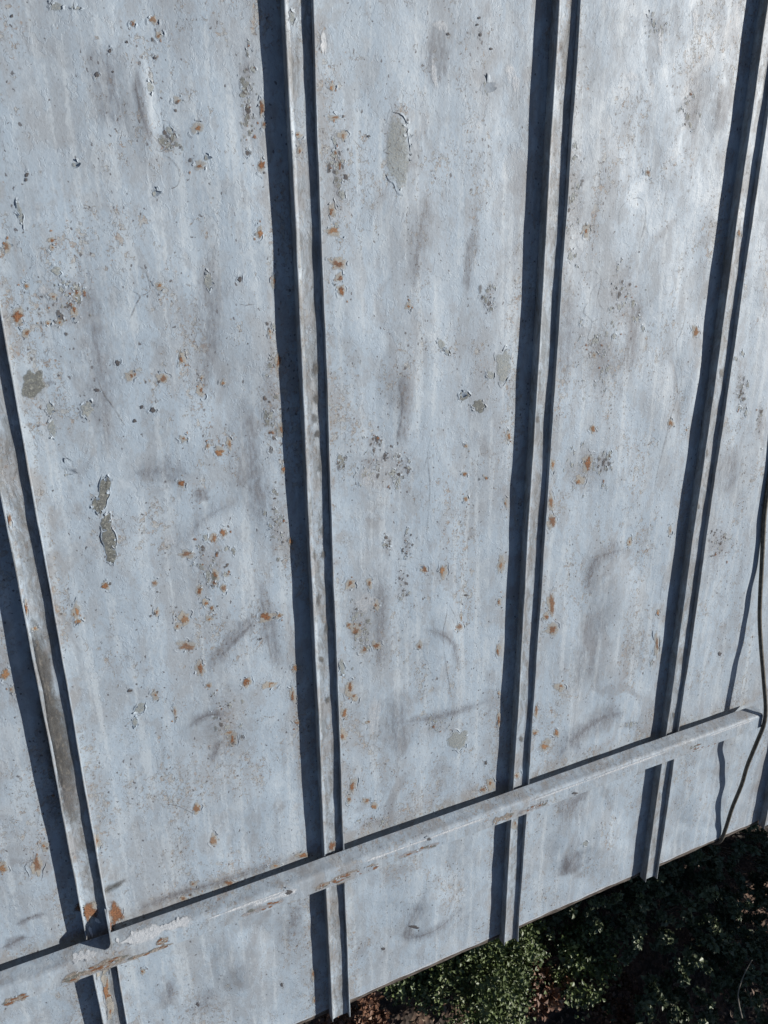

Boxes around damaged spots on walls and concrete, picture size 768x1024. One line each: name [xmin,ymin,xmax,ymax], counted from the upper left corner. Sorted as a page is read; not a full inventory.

peeling [158,124,181,151]
peeling [384,109,413,196]
rust [10,279,81,337]
peeling [457,389,488,413]
rust [571,450,595,488]
peeling [90,474,118,566]
rust [207,523,231,547]
rust [150,564,240,690]
rust [255,609,284,623]
rust [344,618,385,656]
rust [75,898,125,934]